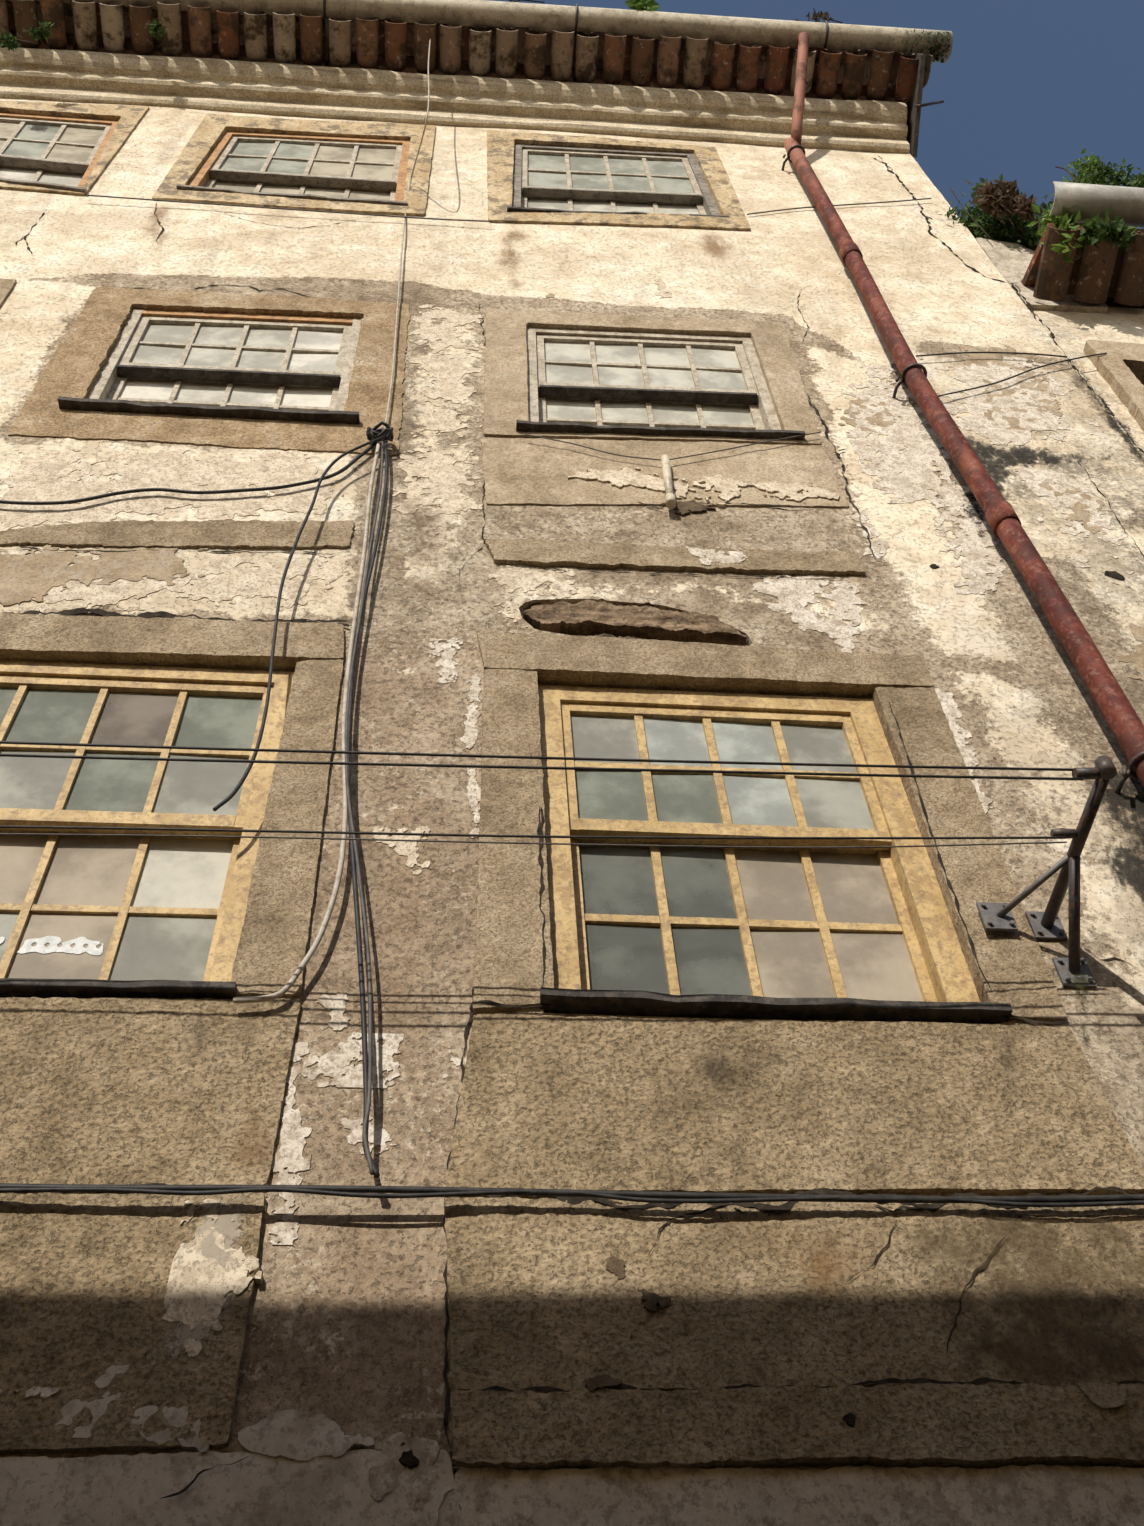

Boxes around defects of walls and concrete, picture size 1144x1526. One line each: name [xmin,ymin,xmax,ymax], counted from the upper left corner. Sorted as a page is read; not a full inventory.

crack [874,155,1144,454]
damp [1071,360,1143,461]
peeling [0,448,344,531]
damp [963,489,985,538]
damp [965,436,1111,498]
peeling [0,545,347,611]
peeling [752,574,866,653]
damp [1102,764,1144,901]
peeling [264,986,404,1246]
crack [443,807,570,1461]
crack [487,1186,1130,1390]
crack [1107,1378,1144,1386]